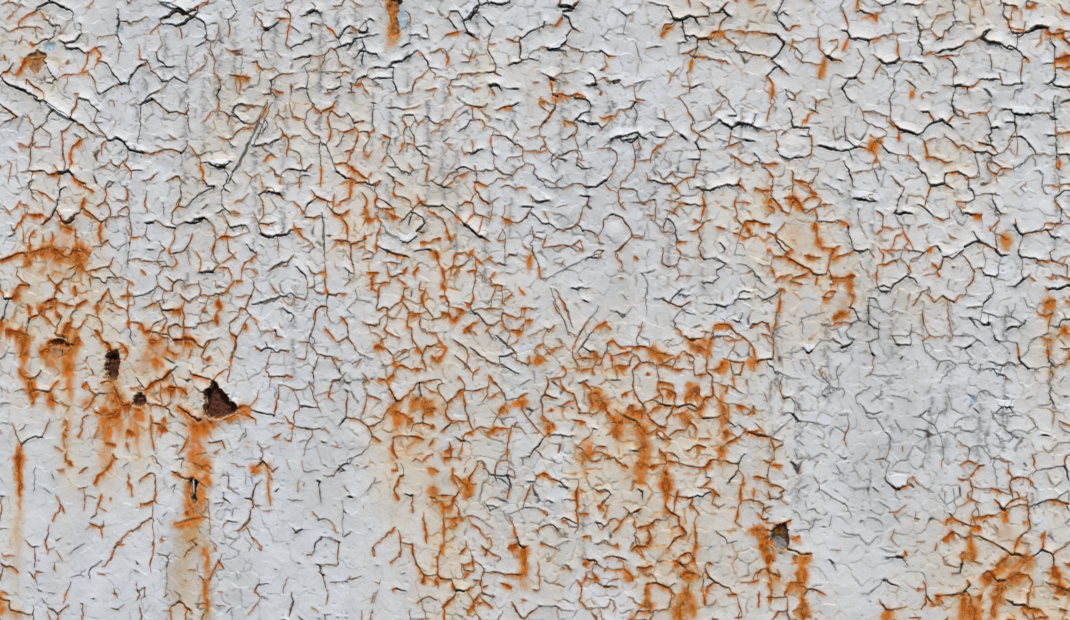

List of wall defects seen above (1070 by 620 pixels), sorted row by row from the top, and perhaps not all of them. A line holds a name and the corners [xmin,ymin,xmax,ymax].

crack [0,0,289,382]
crack [16,368,59,406]
corrosion [18,330,79,402]
corrosion [698,323,730,374]
crack [13,419,50,497]
corrosion [99,392,152,456]
crack [25,366,278,620]
corrosion [595,389,651,484]
crack [0,554,19,579]
crack [0,591,34,620]
corrosion [748,527,776,576]
corrosion [786,536,807,607]